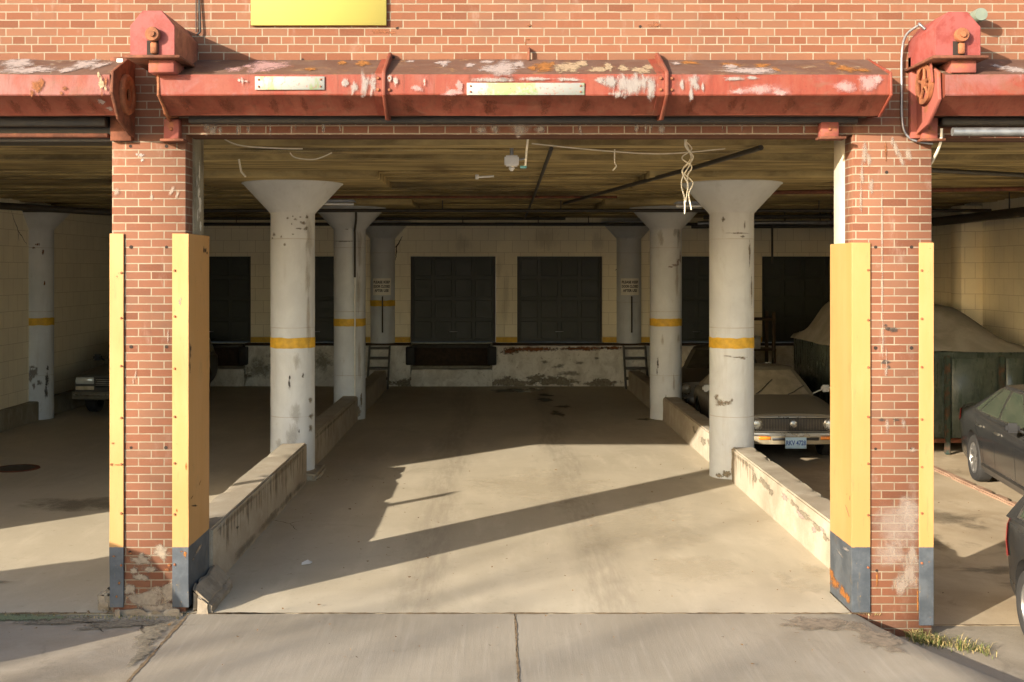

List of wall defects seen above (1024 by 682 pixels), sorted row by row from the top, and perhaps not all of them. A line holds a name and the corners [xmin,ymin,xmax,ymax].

peeling [338,60,398,94]
peeling [466,60,655,96]
peeling [722,63,786,95]
corrosion [500,346,621,355]
spalling [753,473,829,541]
spalling [129,544,171,574]
corrosion [830,569,850,603]